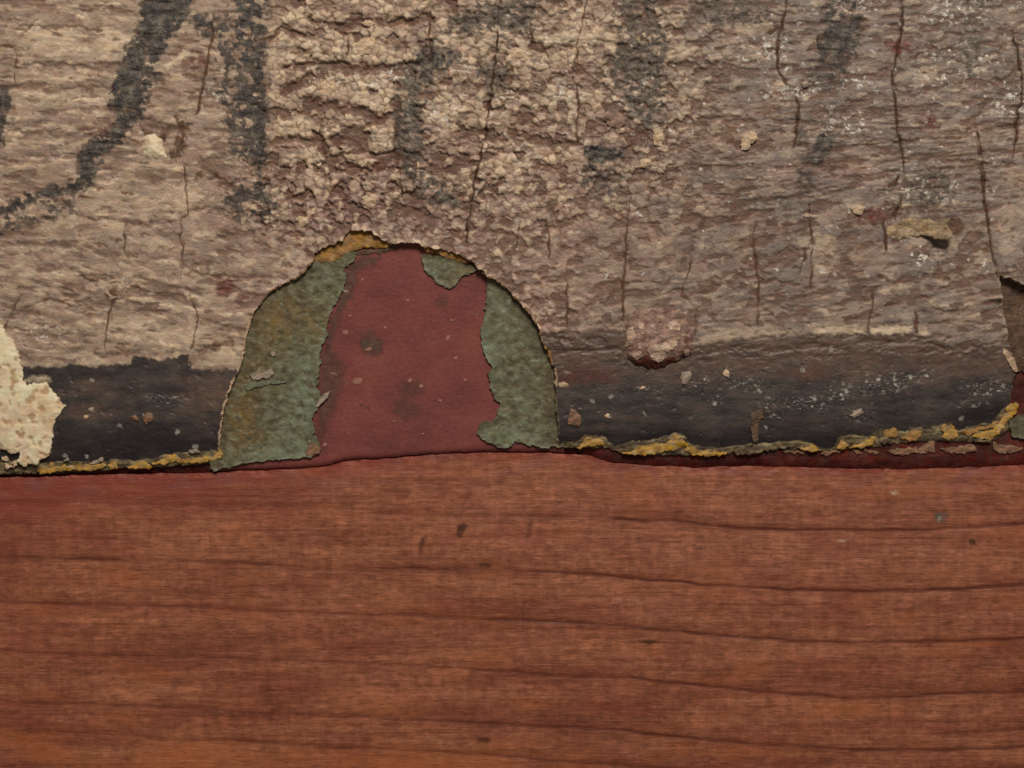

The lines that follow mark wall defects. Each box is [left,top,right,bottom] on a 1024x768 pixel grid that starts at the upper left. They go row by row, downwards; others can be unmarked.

crack [465,0,501,242]
crack [721,0,1023,333]
peeling [0,230,1024,475]